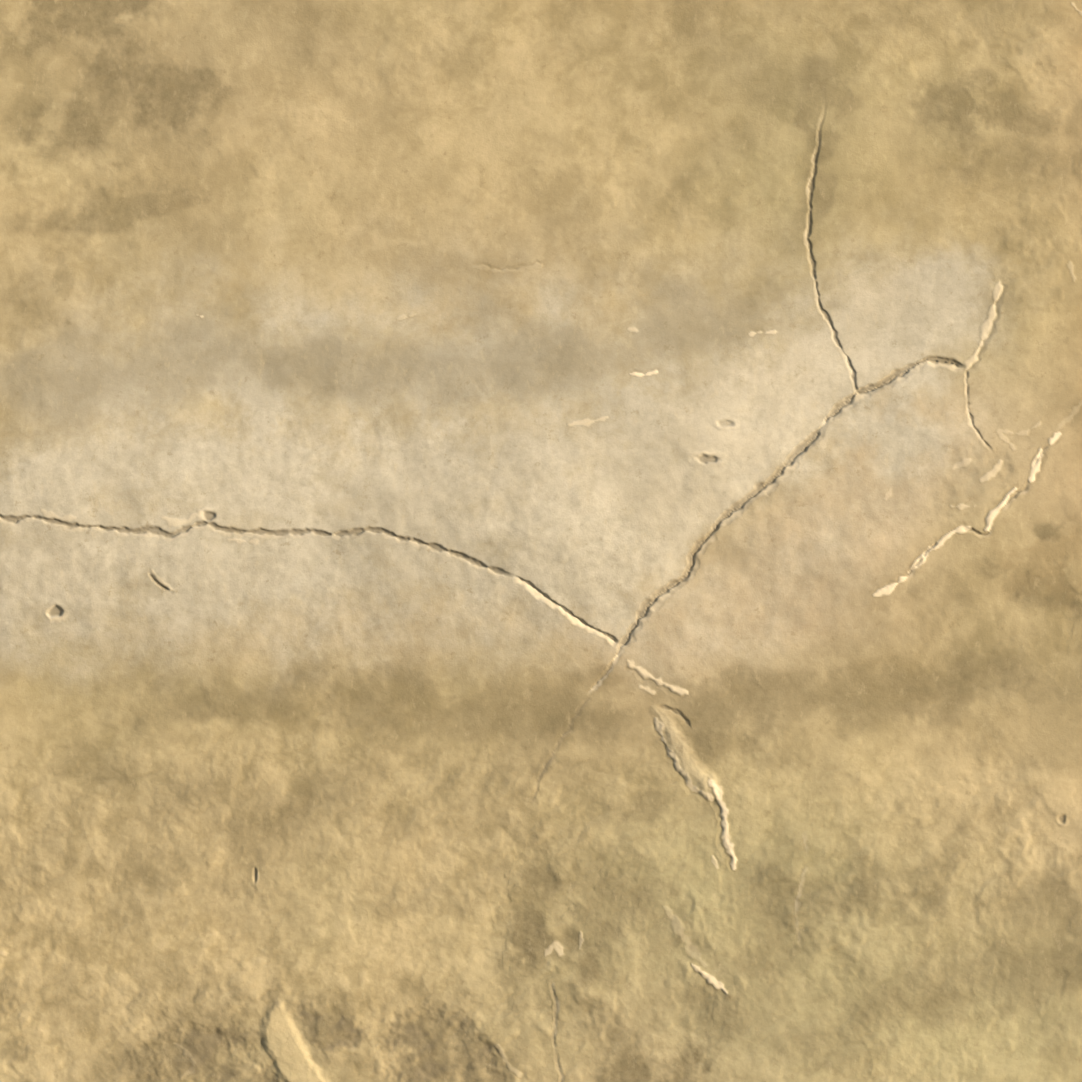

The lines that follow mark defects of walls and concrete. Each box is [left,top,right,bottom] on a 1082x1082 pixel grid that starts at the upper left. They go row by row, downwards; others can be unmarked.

crack [1067,260,1077,283]
crack [0,88,1009,807]
crack [870,398,1082,597]
flaking render [648,703,738,875]